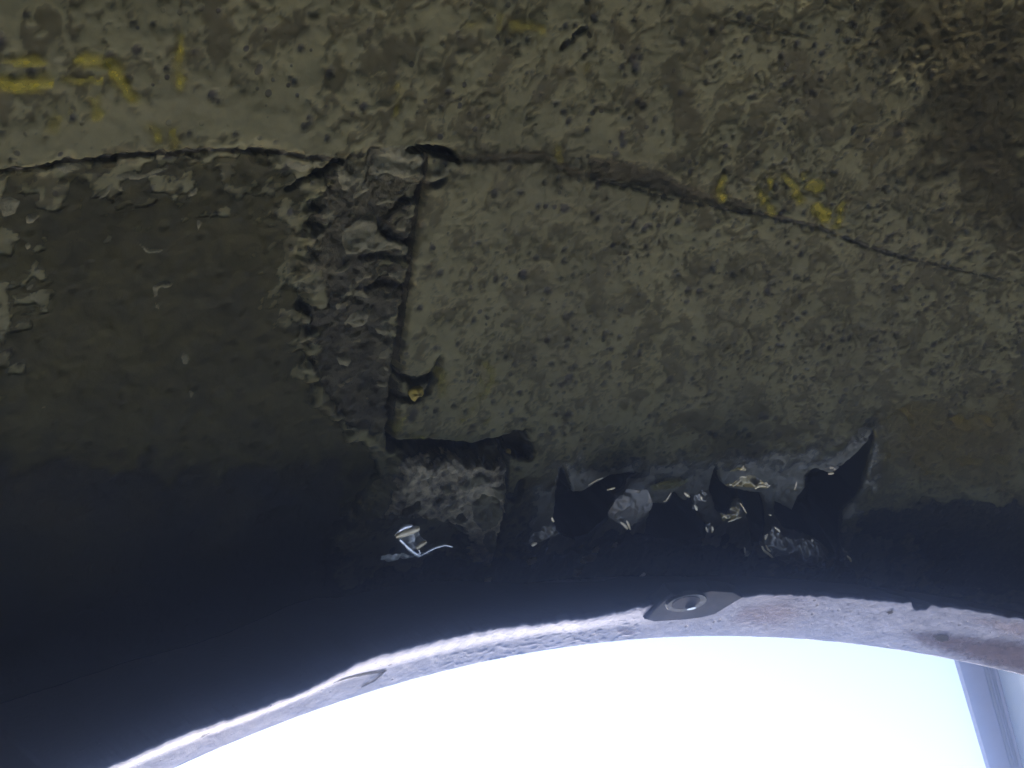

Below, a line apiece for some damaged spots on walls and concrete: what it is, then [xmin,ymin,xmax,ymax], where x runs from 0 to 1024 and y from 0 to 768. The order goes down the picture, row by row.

crack [0,146,340,188]
spalling [297,144,449,436]
crack [359,144,1024,501]
spalling [383,429,533,568]